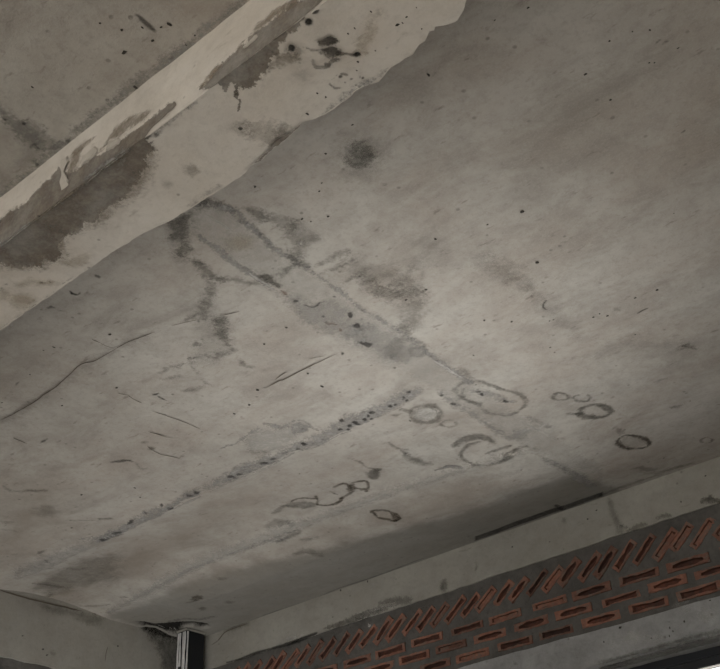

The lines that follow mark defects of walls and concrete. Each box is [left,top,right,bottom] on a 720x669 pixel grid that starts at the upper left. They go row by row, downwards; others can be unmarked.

peeling [199,0,322,111]
peeling [0,101,176,269]
crack [1,333,151,420]
damp [415,406,437,420]